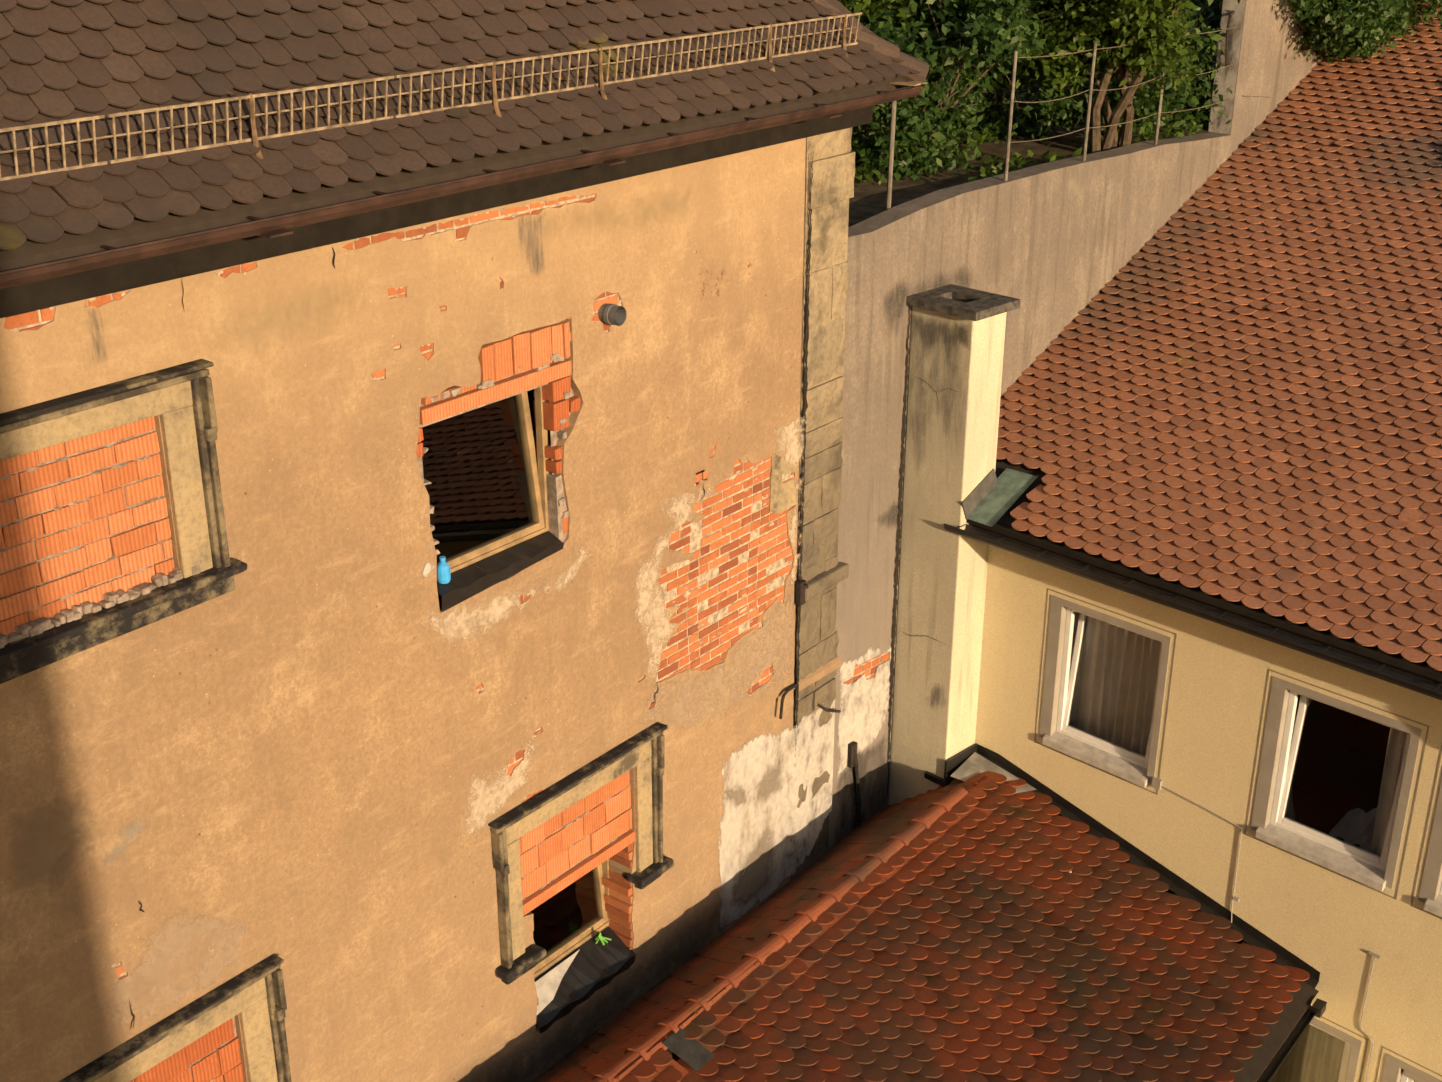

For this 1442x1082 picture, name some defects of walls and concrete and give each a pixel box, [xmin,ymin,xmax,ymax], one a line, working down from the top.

spalling [342,193,596,249]
spalling [4,307,55,332]
spalling [84,291,129,307]
spalling [637,442,799,683]